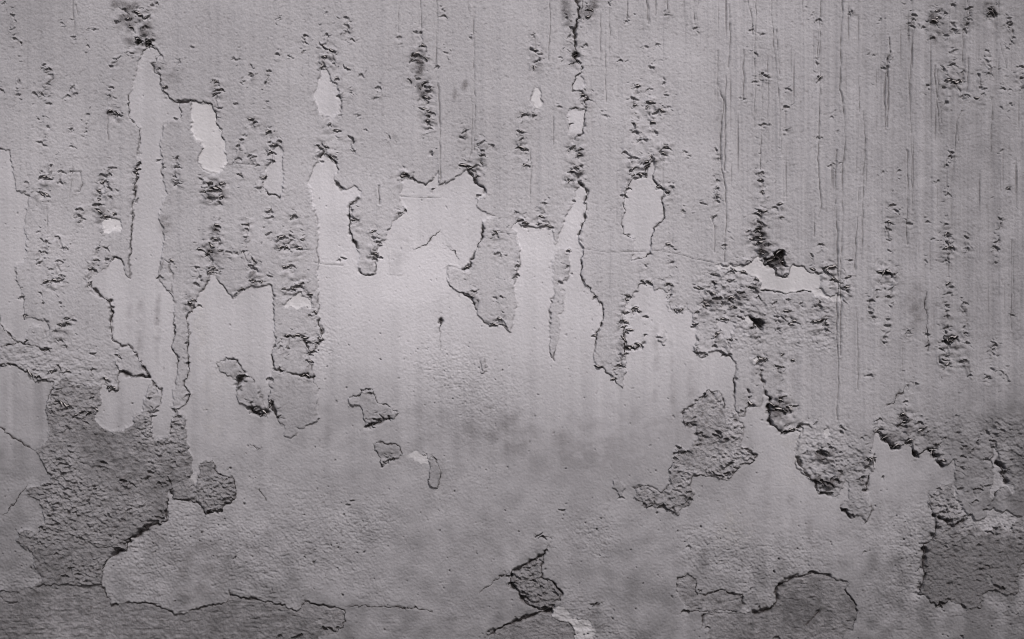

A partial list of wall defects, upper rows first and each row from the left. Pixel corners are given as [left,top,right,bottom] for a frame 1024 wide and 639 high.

peeling [191,75,286,210]
peeling [228,27,373,158]
peeling [404,25,452,161]
peeling [514,87,543,173]
peeling [555,3,596,69]
peeling [573,74,593,107]
peeling [628,76,674,148]
peeling [738,24,796,138]
peeling [0,149,80,356]
flaking render [13,0,236,587]
peeling [102,108,1024,639]
flaking render [0,356,346,639]